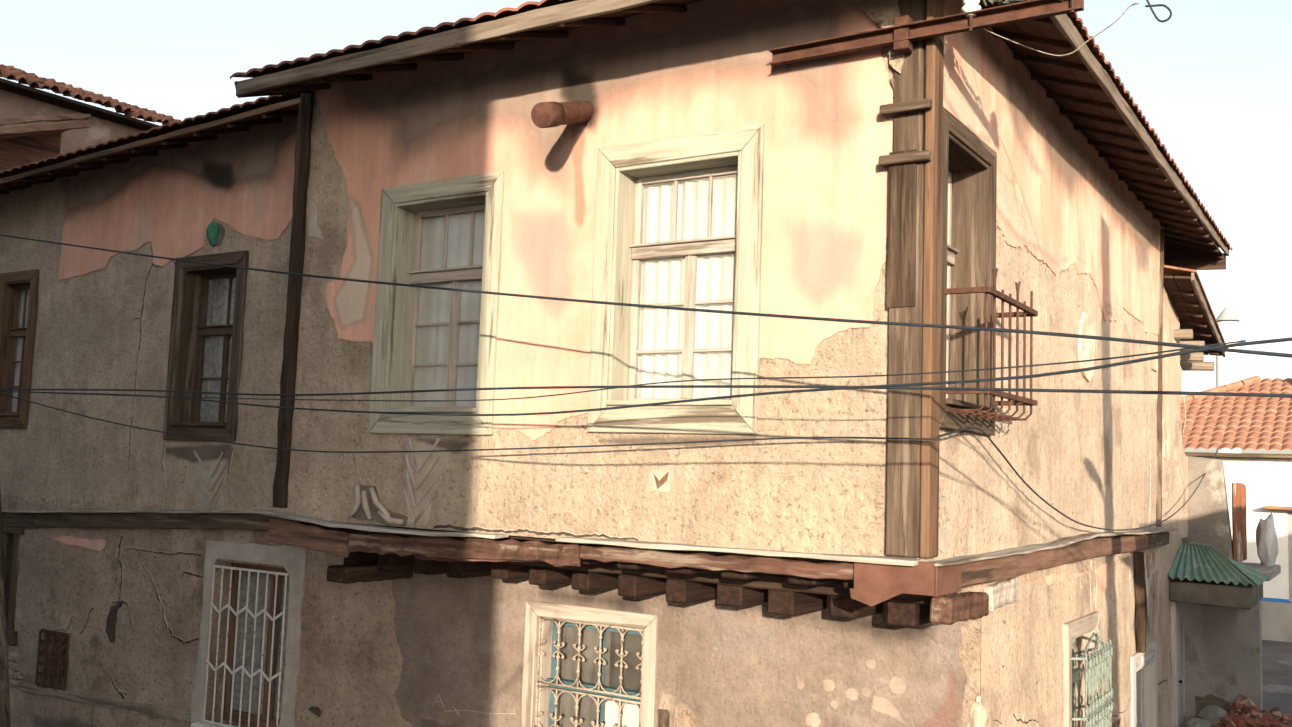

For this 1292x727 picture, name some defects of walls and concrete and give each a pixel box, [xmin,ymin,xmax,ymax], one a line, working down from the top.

peeling [944,0,964,16]
peeling [58,116,297,280]
peeling [309,197,323,239]
peeling [317,0,905,440]
peeling [943,27,1182,465]
crack [129,242,176,472]
crack [81,536,203,645]
spalling [938,496,953,553]